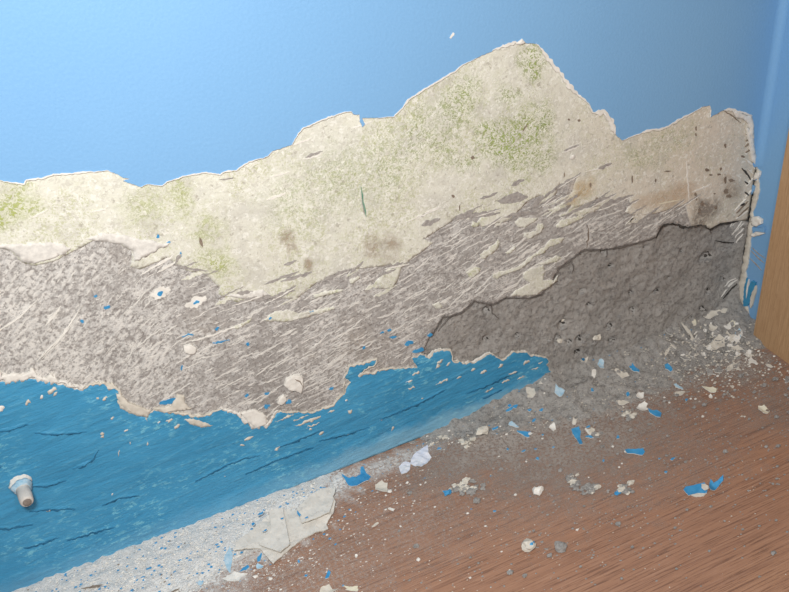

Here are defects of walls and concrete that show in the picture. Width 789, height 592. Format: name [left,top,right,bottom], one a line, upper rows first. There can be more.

water stain [483,114,550,170]
water stain [0,189,37,226]
peeling [0,39,773,446]
water stain [123,194,714,418]
crack [433,221,739,334]
crack [0,422,87,436]
crack [0,448,115,549]
crack [103,494,139,505]